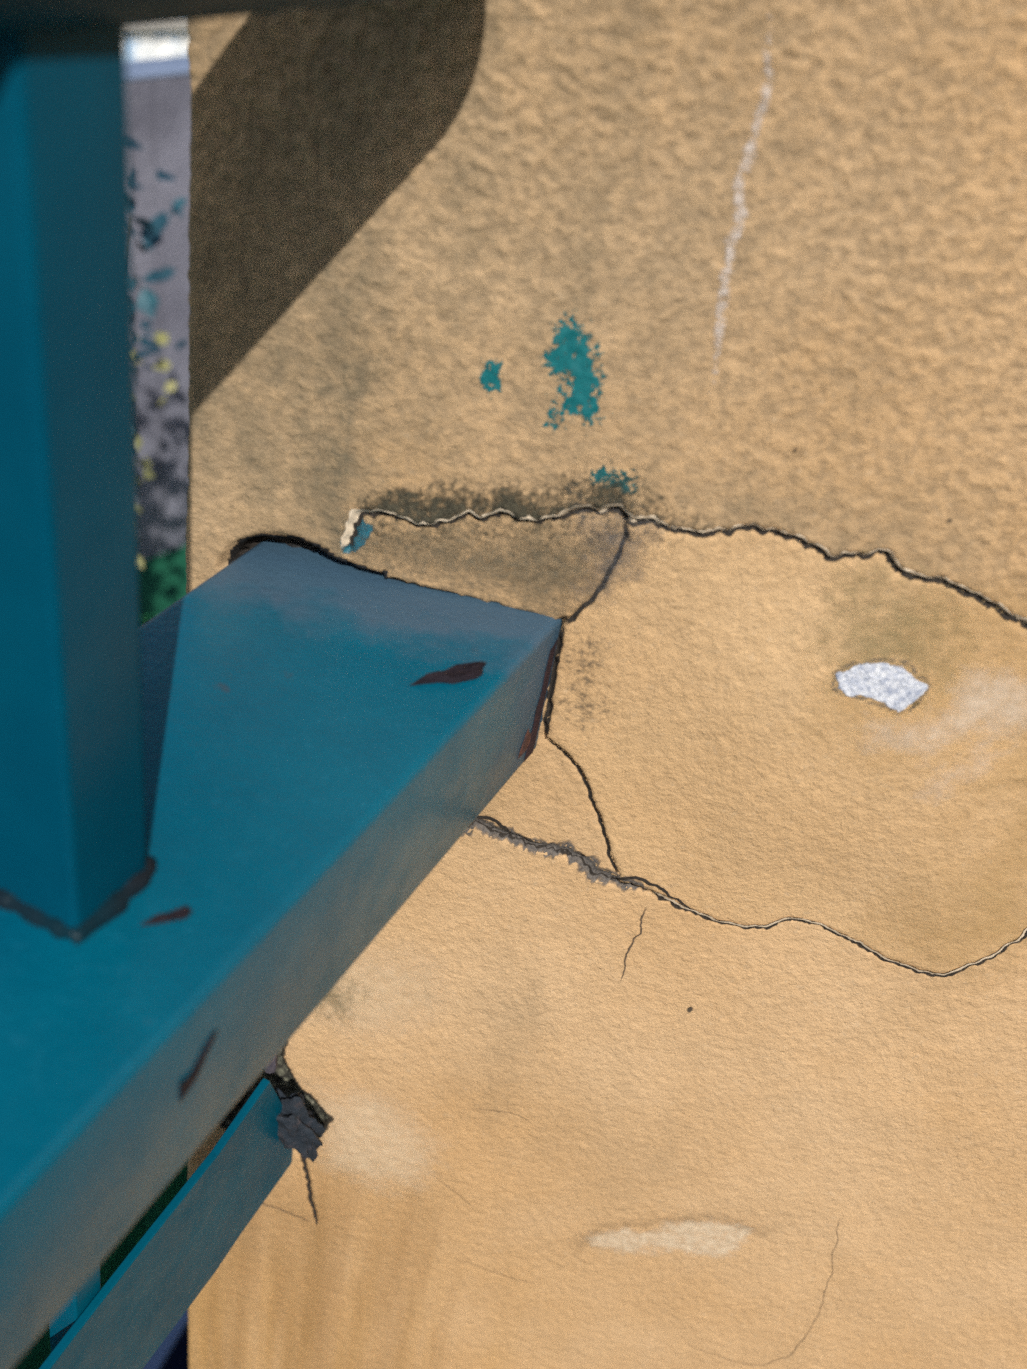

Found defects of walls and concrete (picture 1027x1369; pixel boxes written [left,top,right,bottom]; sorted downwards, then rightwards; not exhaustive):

leakage [364,474,665,564]
rust [518,639,558,762]
crack [341,504,1027,978]
peeling [833,659,928,712]
spalling [218,1042,333,1130]
peeling [588,1221,751,1256]